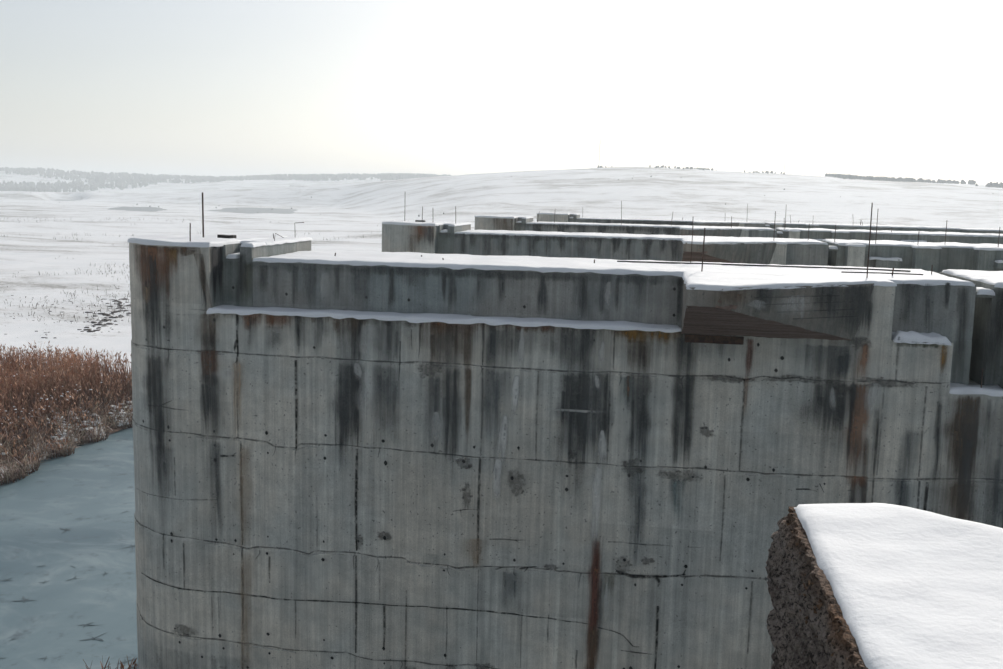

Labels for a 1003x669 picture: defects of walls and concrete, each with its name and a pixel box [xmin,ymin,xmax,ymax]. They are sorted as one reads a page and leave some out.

water stain [352,266,411,304]
water stain [426,269,525,303]
water stain [538,273,570,312]
water stain [146,357,164,445]
water stain [339,320,362,445]
water stain [435,349,470,445]
water stain [561,375,609,460]
water stain [673,338,694,456]
corrosion [847,385,868,462]
corrosion [589,541,599,669]